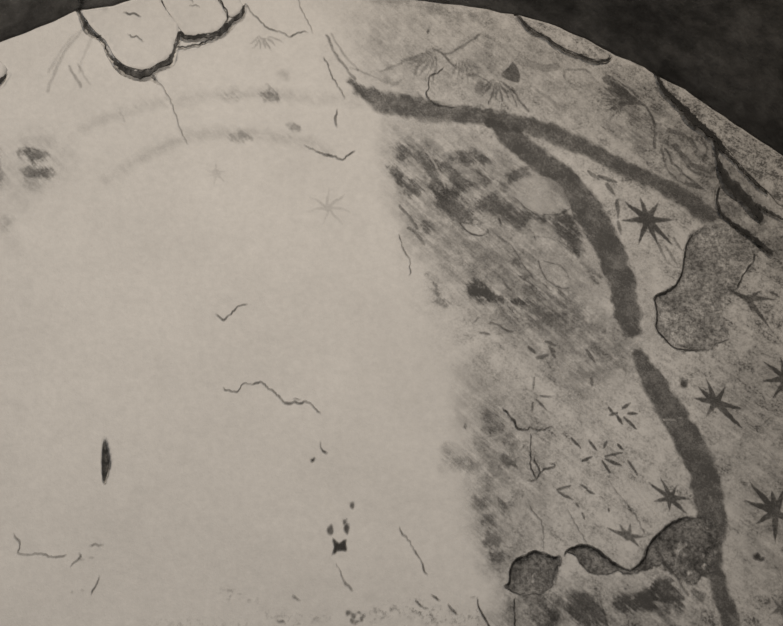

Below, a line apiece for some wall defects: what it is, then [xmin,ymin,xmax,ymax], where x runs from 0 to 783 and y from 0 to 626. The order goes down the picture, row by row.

flaking render [83,0,243,72]
flaking render [521,18,612,60]
flaking render [661,80,783,207]
spalling [653,225,760,352]
crack [224,381,319,412]
spalling [504,516,719,595]